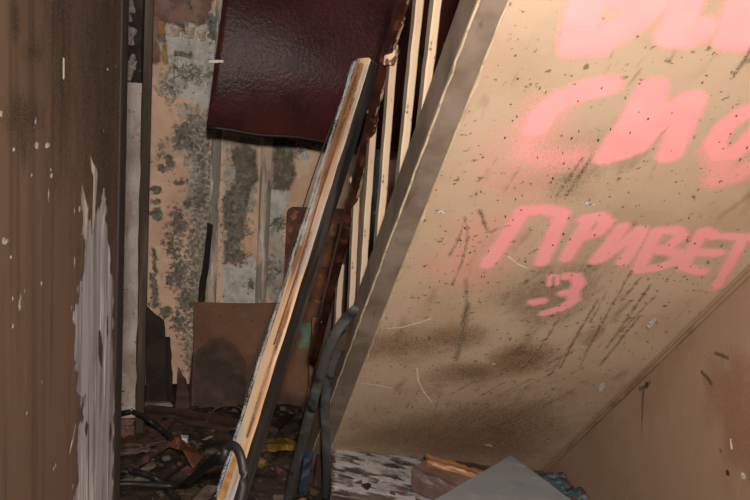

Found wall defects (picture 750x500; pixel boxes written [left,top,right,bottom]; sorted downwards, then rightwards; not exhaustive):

peeling [71,156,115,500]
water stain [147,98,251,409]
water stain [216,136,261,285]
water stain [267,203,288,303]
water stain [334,257,641,465]